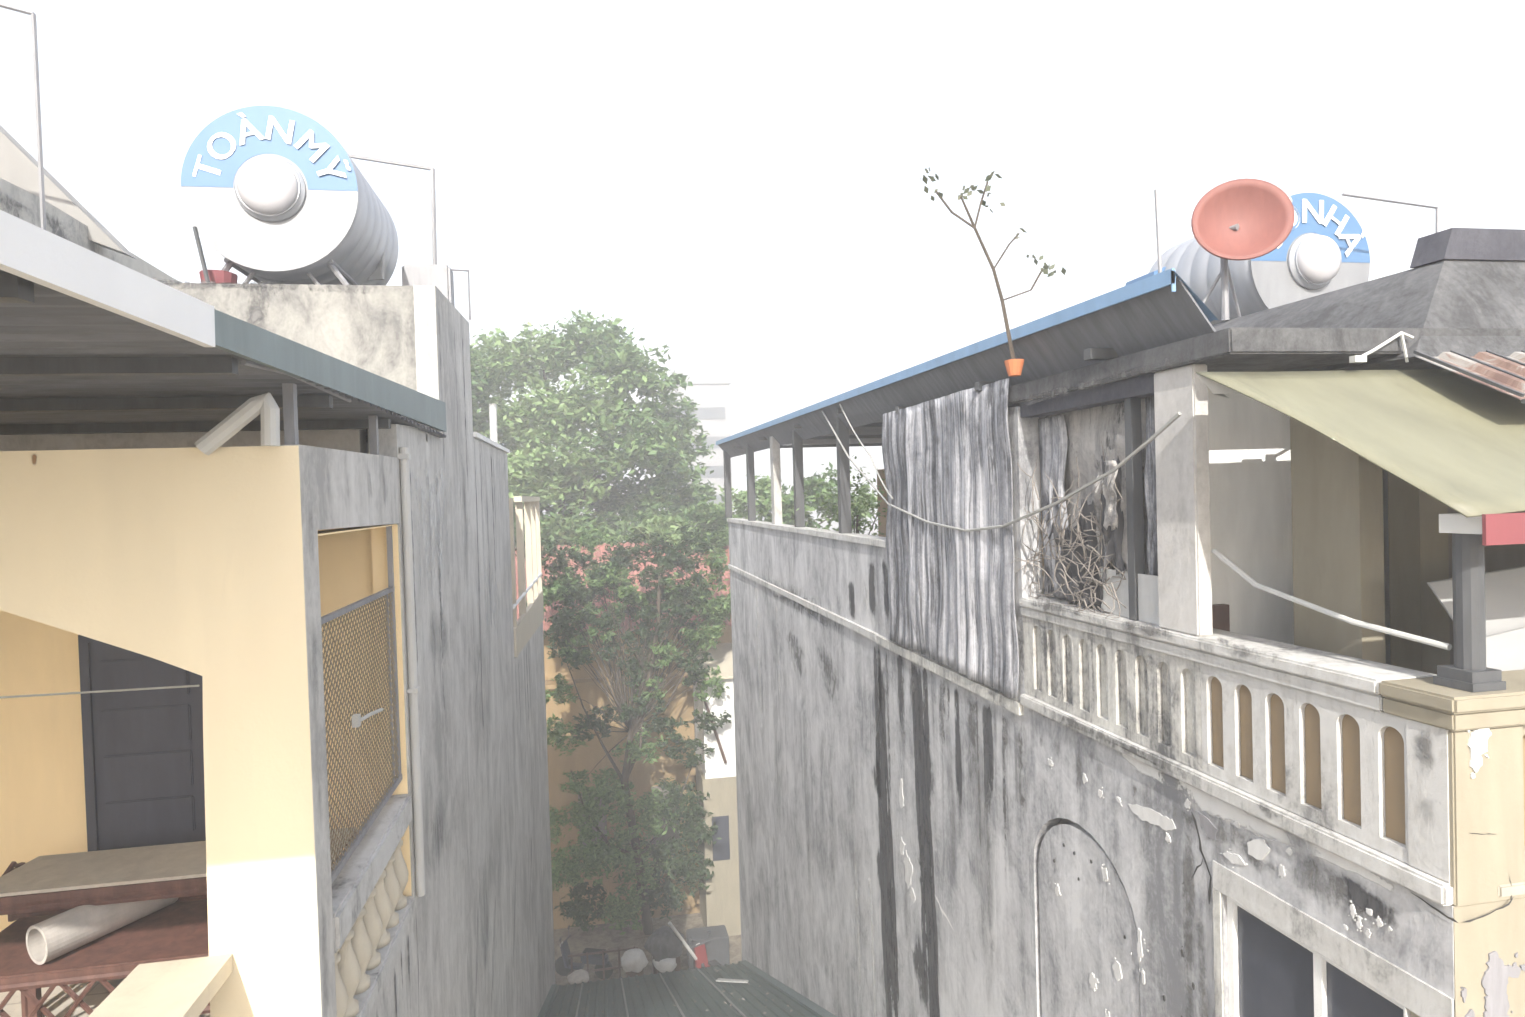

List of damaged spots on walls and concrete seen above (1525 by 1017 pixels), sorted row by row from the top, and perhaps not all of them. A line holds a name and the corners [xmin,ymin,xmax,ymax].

leakage [1417,735,1431,762]
peeling [1466,728,1492,779]
leakage [855,647,1024,1017]
leakage [1060,716,1290,1017]
leakage [1304,842,1394,923]
flaking render [1343,900,1392,938]
peeling [1460,951,1525,1017]